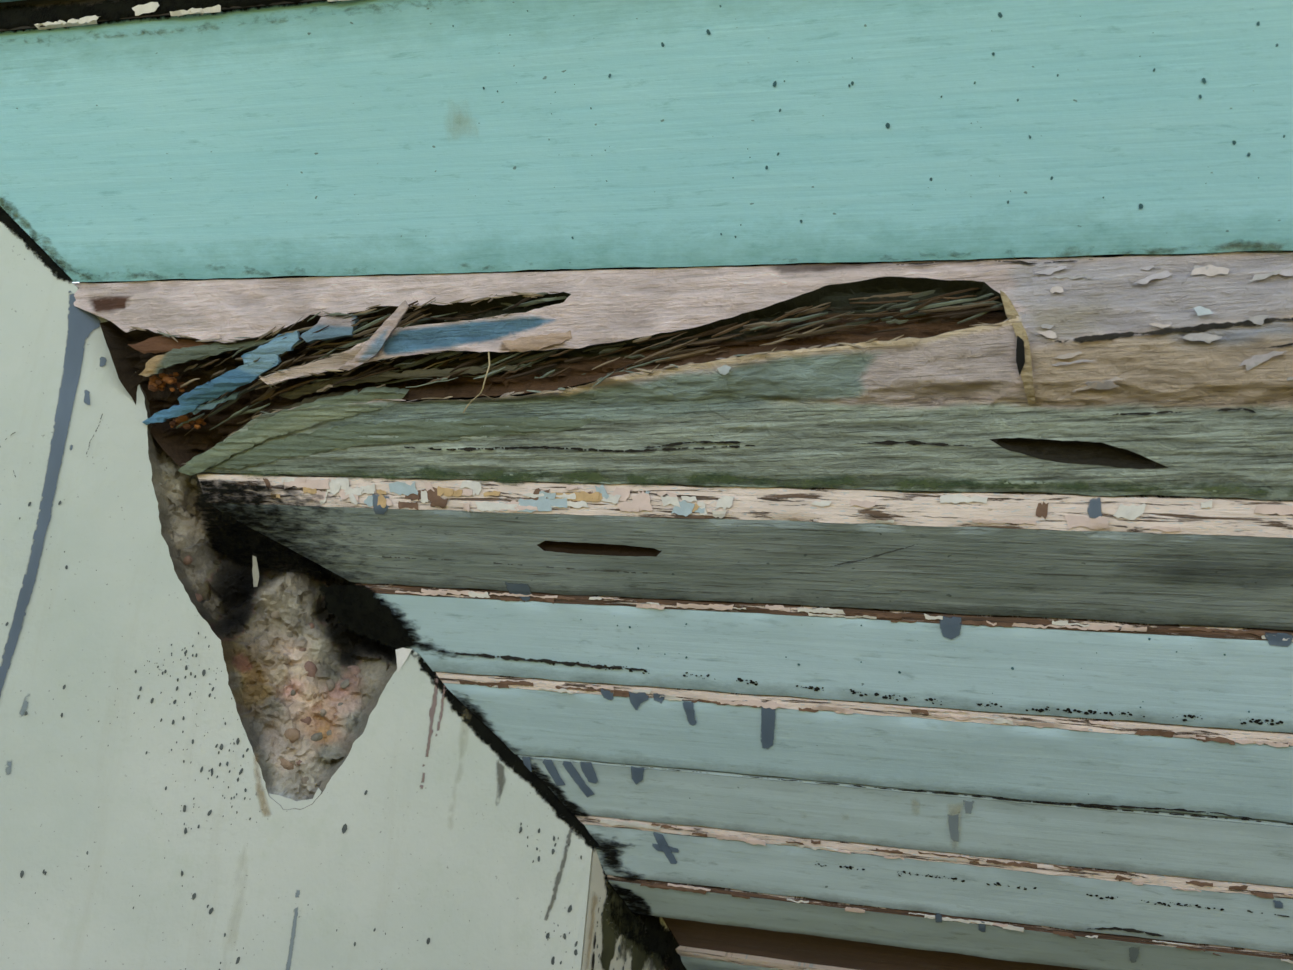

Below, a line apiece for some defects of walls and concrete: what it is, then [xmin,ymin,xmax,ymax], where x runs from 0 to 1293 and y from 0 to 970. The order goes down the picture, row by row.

peeling [1182,333,1222,343]
crack [404,441,755,452]
crack [861,439,968,447]
peeling [252,477,734,519]
peeling [940,494,1049,525]
peeling [1064,503,1181,532]
peeling [1254,504,1293,515]
spalling [139,384,412,810]
peeling [459,680,854,714]
water stain [196,479,687,970]
peeling [1135,730,1293,747]
peeling [1229,885,1293,899]